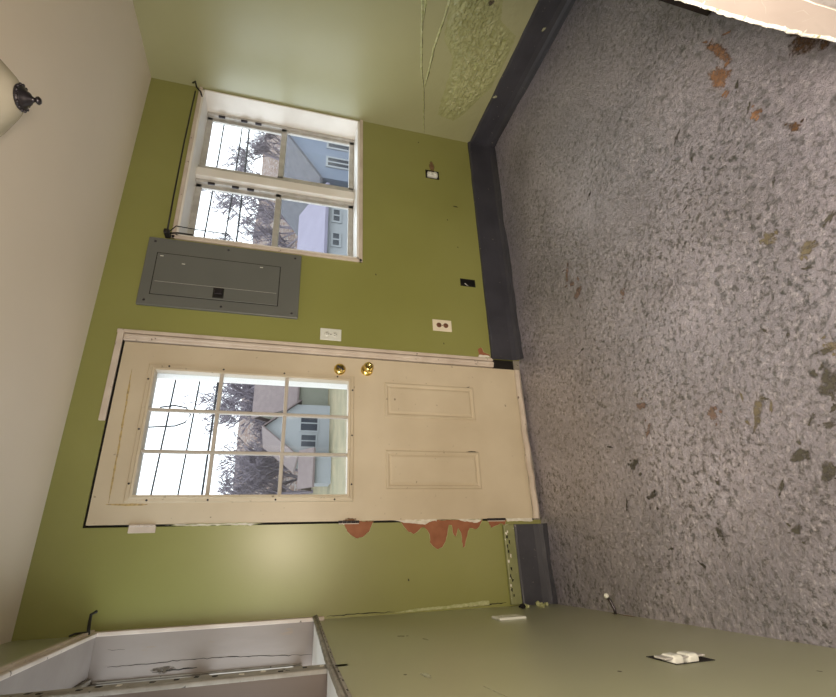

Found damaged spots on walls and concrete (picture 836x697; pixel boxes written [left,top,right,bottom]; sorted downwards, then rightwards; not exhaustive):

crack [420,0,449,131]
peeling [343,521,374,539]
peeling [394,518,548,609]